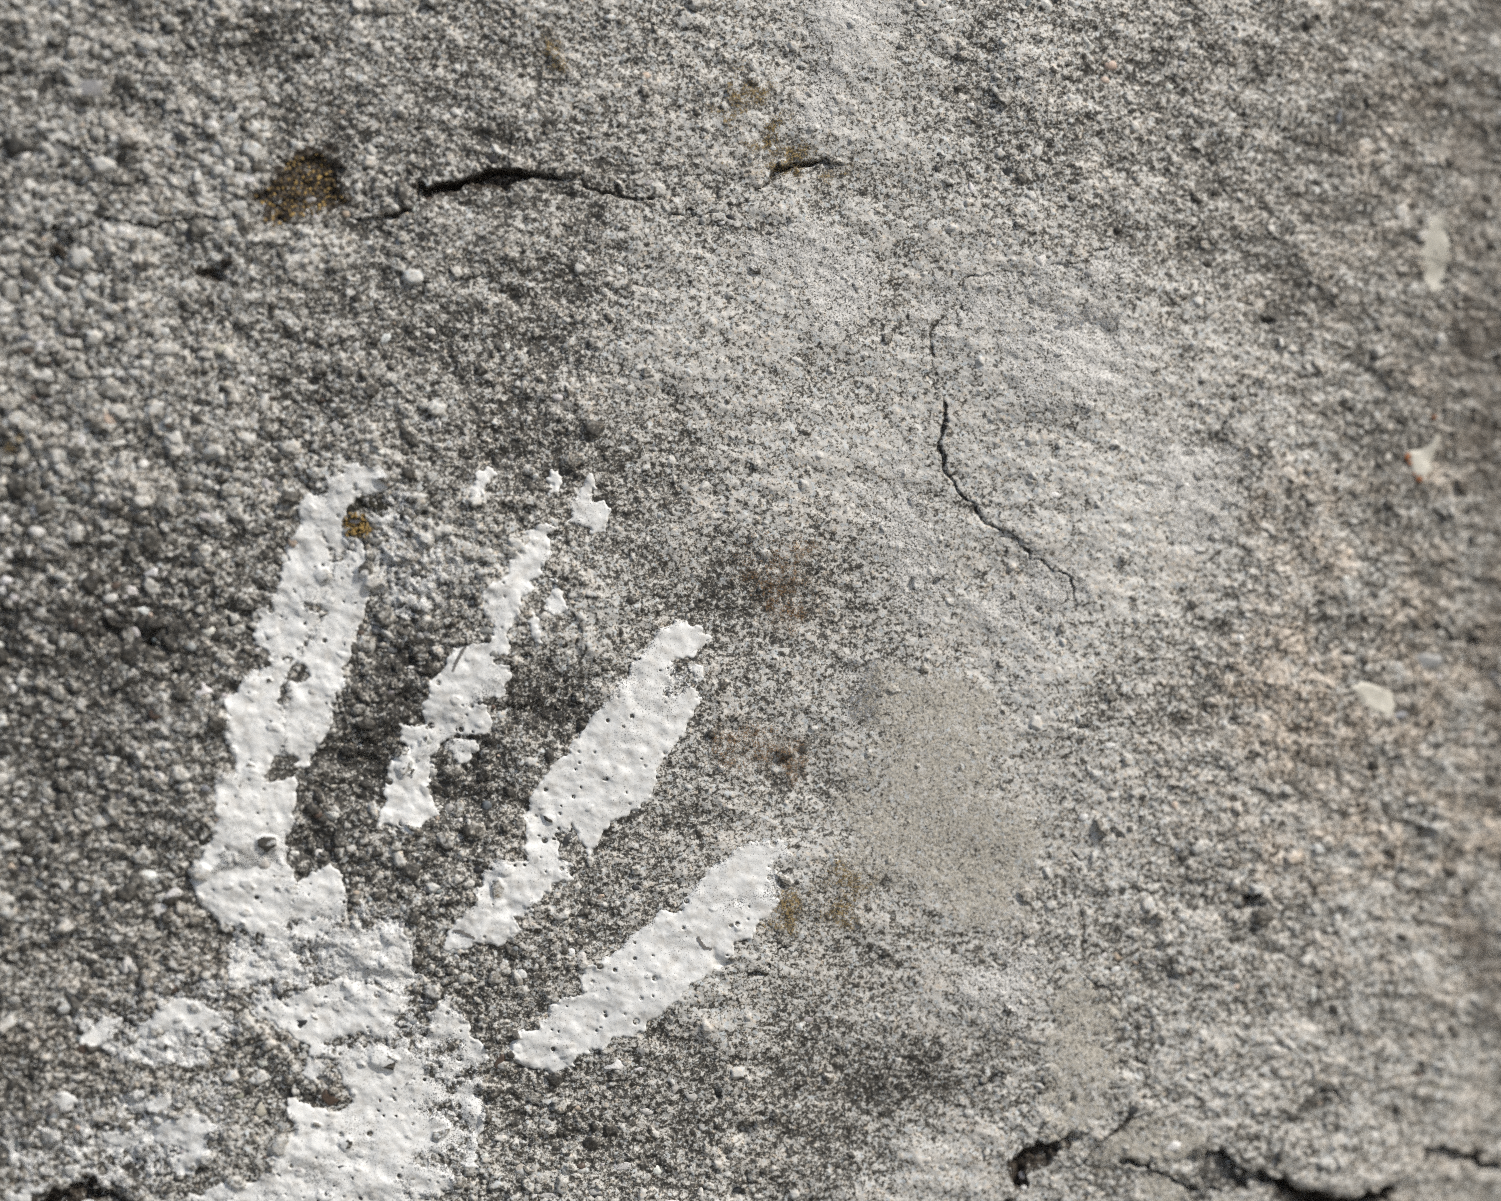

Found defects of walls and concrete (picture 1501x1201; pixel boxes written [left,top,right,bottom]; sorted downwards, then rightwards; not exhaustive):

crack [355,158,844,220]
crack [1006,849,1500,1201]